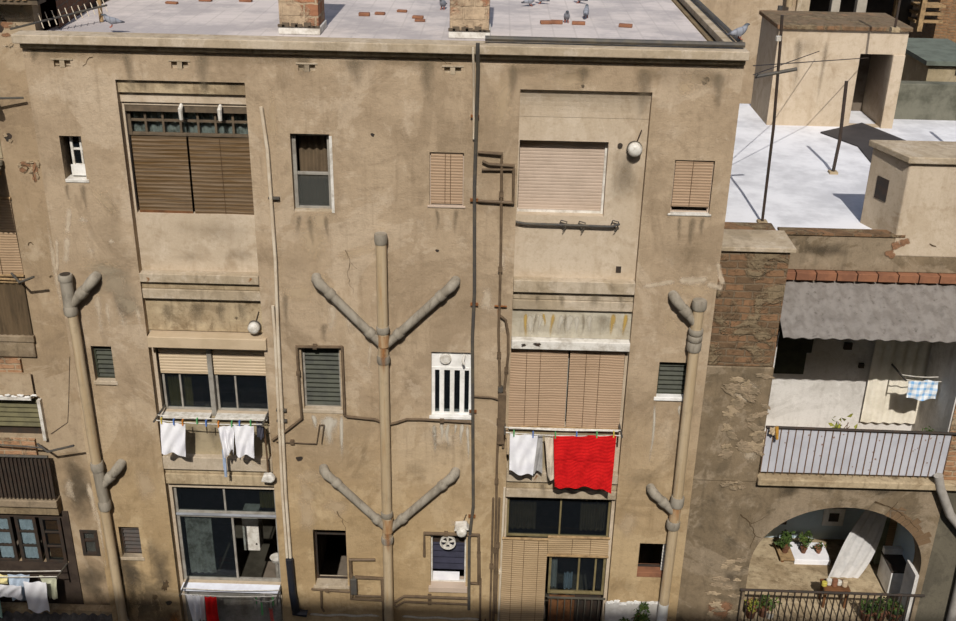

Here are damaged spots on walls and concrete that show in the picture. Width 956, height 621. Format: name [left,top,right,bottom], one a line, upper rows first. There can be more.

spalling [17,160,40,182]
peeling [718,373,775,460]
spalling [706,558,747,618]